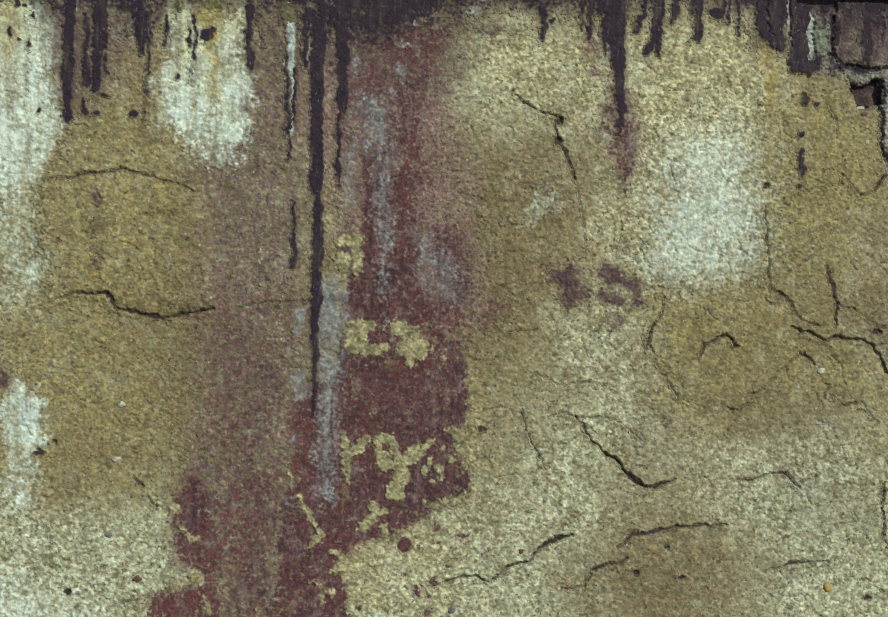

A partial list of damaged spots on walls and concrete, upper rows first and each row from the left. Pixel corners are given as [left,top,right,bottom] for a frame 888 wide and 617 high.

damp [0,0,121,313]
crack [54,166,199,193]
damp [131,2,268,181]
corrosion [193,10,227,105]
damp [537,2,550,44]
damp [578,0,705,136]
damp [754,0,888,166]
flaking render [813,16,888,173]
crack [29,290,216,321]
crack [726,206,888,413]
crack [520,410,677,491]
crack [432,533,575,588]